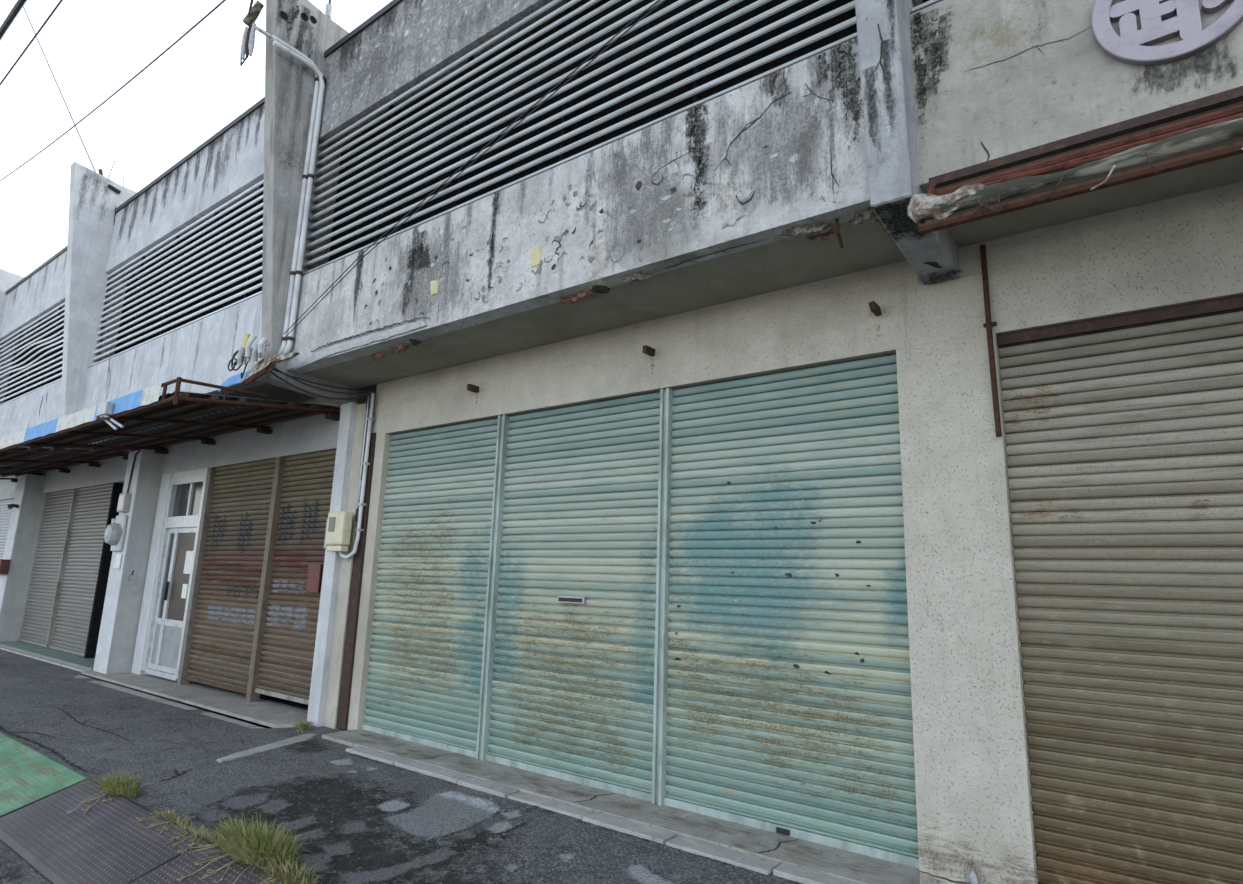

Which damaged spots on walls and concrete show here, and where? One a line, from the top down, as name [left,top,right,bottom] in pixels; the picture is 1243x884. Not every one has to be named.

damp [585,0,902,259]
crack [713,84,832,171]
crack [830,152,839,194]
damp [910,11,952,138]
crack [969,27,1090,70]
damp [1133,45,1236,93]
damp [394,207,471,321]
rust [243,362,272,384]
rust [382,511,458,696]
rust [510,604,633,767]
rust [673,640,896,814]